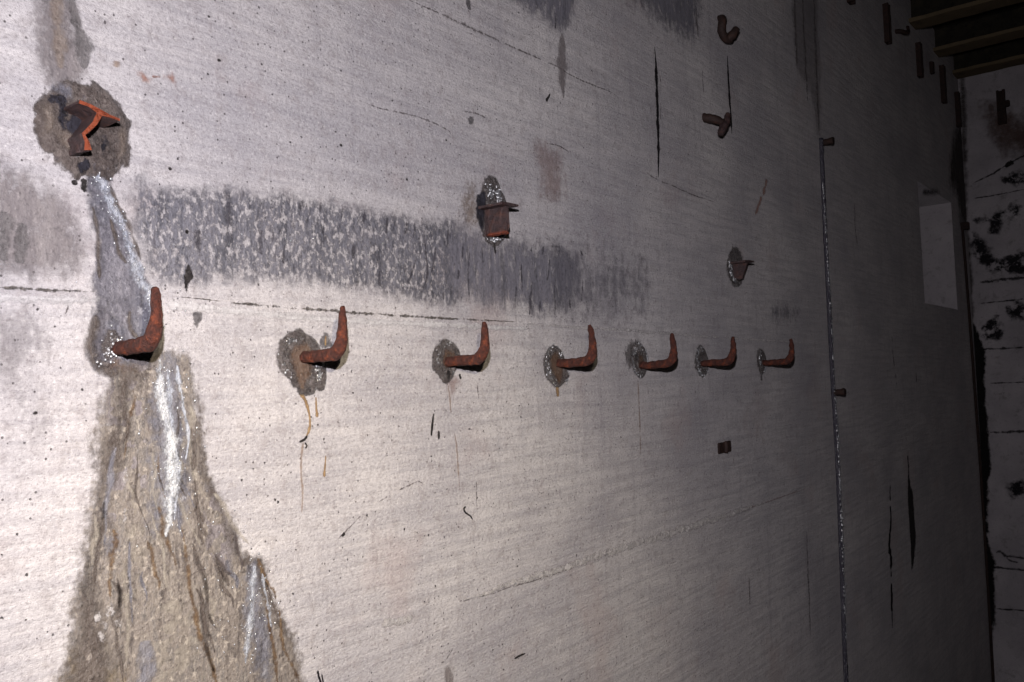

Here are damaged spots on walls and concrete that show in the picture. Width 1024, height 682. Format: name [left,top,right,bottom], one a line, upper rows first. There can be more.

leakage [38,0,94,84]
spalling [33,80,132,192]
crack [651,53,713,202]
crack [702,56,732,133]
spalling [476,175,506,253]
corrosion [299,394,318,505]
leakage [58,172,590,682]